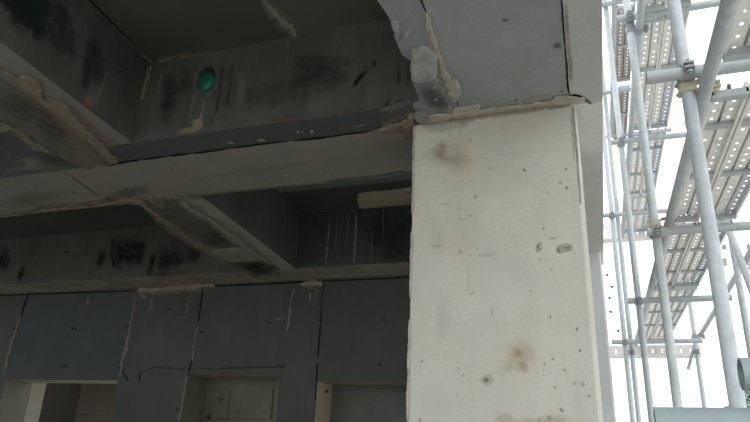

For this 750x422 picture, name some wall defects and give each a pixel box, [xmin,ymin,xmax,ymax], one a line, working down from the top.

crack [561,0,592,104]